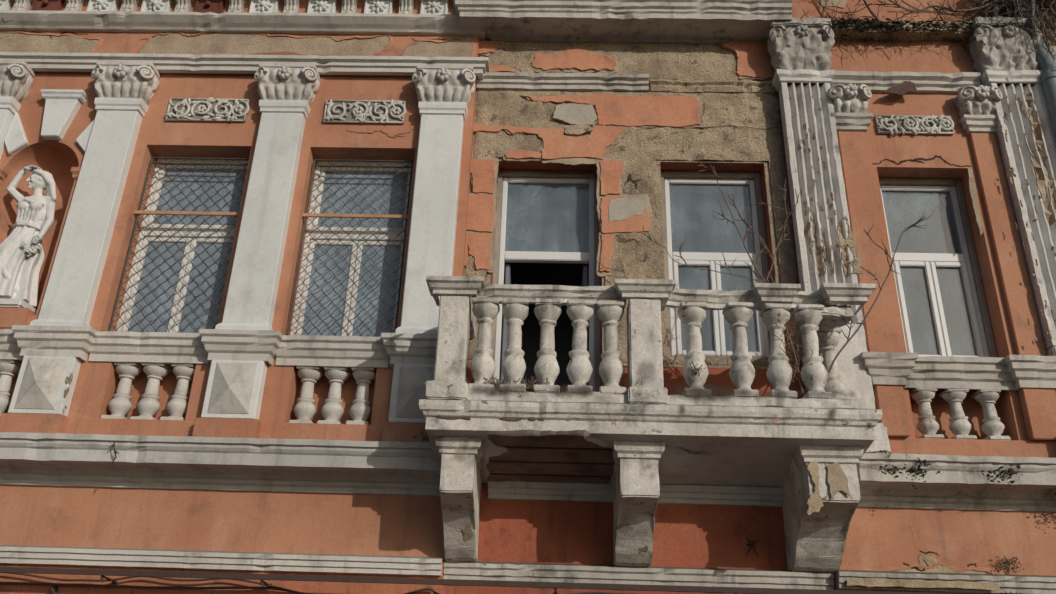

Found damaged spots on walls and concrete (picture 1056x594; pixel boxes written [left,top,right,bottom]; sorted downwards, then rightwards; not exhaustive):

flaking render [138,32,619,73]
flaking render [716,40,775,81]
flaking render [464,93,703,277]
peeling [797,123,826,169]
crack [872,155,971,167]
peeling [994,92,1056,247]
peeling [801,179,863,277]
spalling [482,418,615,486]
peeling [807,461,850,515]
peeling [846,552,1005,590]